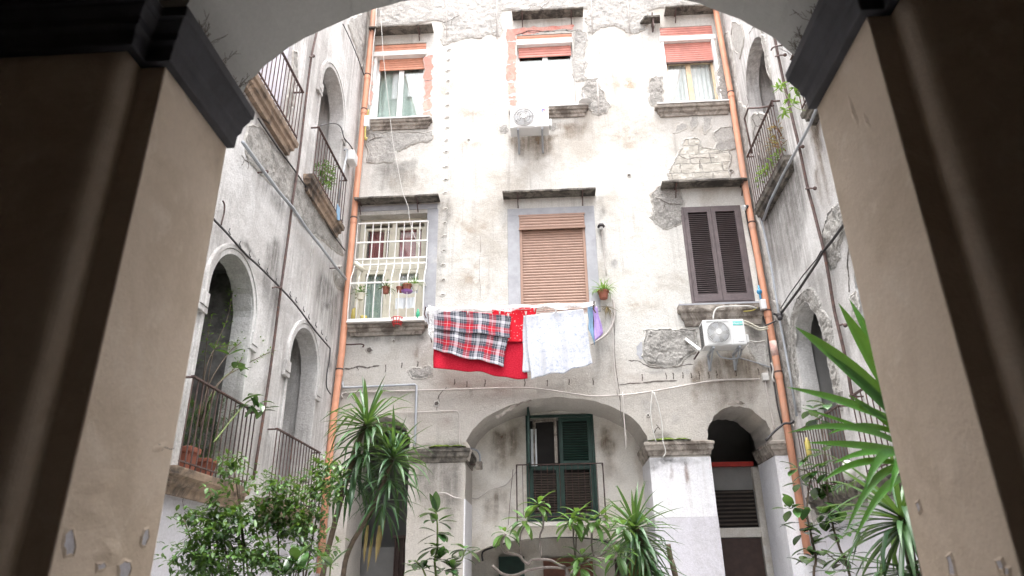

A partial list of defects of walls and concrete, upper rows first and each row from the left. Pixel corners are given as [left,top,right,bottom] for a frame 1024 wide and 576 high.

flaking render [348,0,699,297]
flaking render [641,21,845,428]